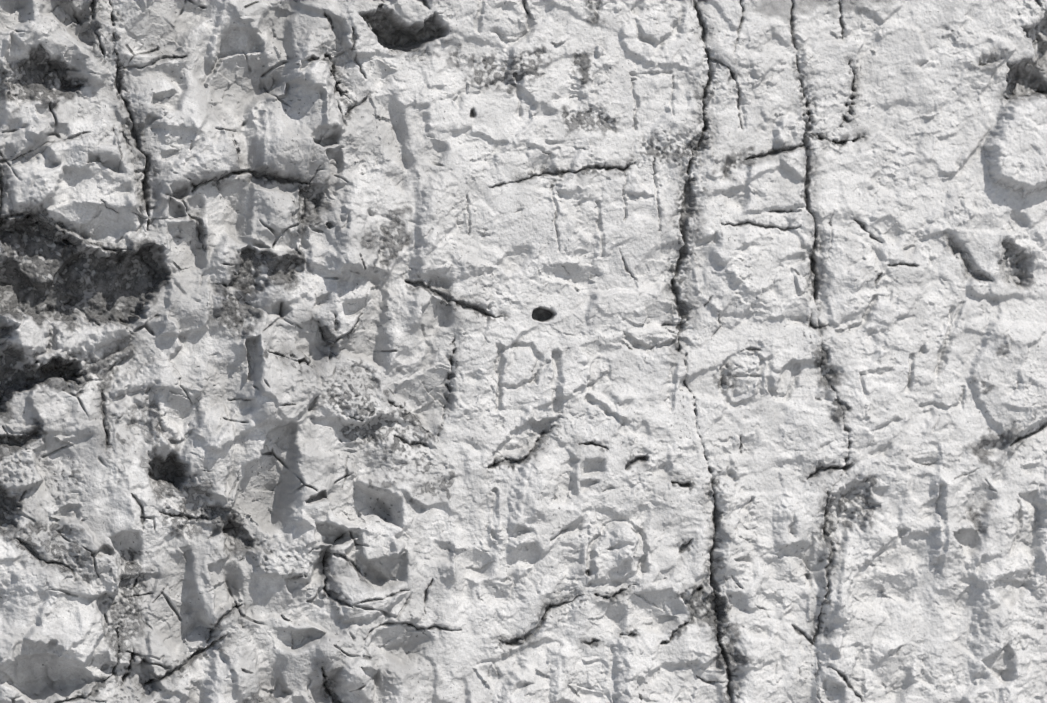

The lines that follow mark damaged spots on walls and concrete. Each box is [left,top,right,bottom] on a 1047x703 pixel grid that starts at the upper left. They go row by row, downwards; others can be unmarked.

crack [0,0,313,255]
crack [497,160,640,186]
crack [733,0,867,329]
crack [1001,91,1047,100]
crack [795,428,856,643]